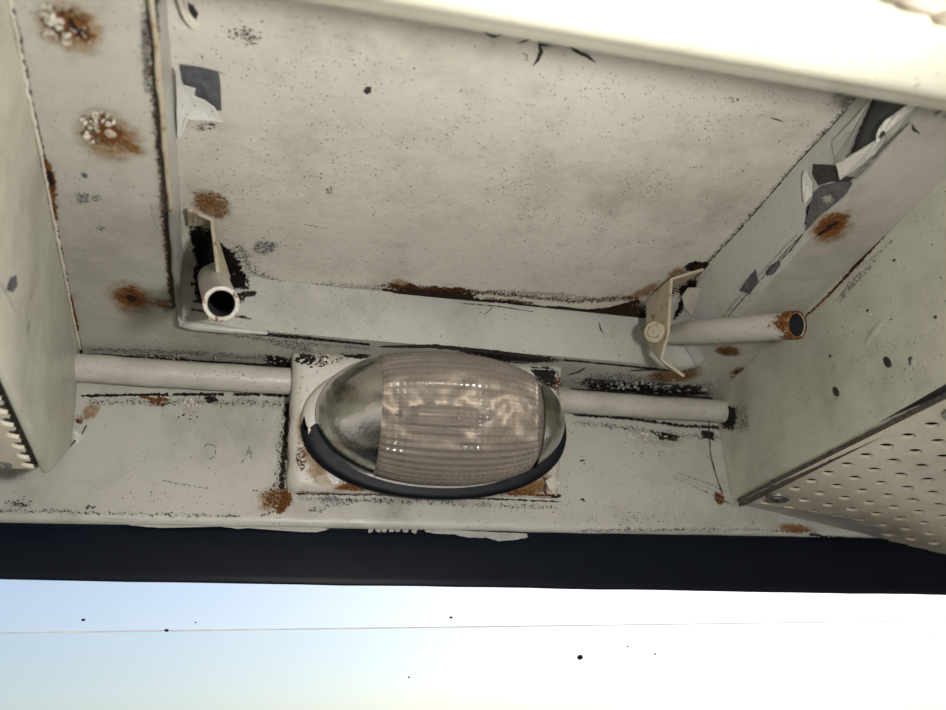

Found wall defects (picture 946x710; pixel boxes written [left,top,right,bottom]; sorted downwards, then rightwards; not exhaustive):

corrosion [36,0,97,50]
corrosion [79,111,139,156]
corrosion [189,189,232,219]
corrosion [812,212,849,241]
corrosion [113,286,175,310]
corrosion [381,281,657,318]
corrosion [768,236,885,340]
corrosion [252,486,293,517]